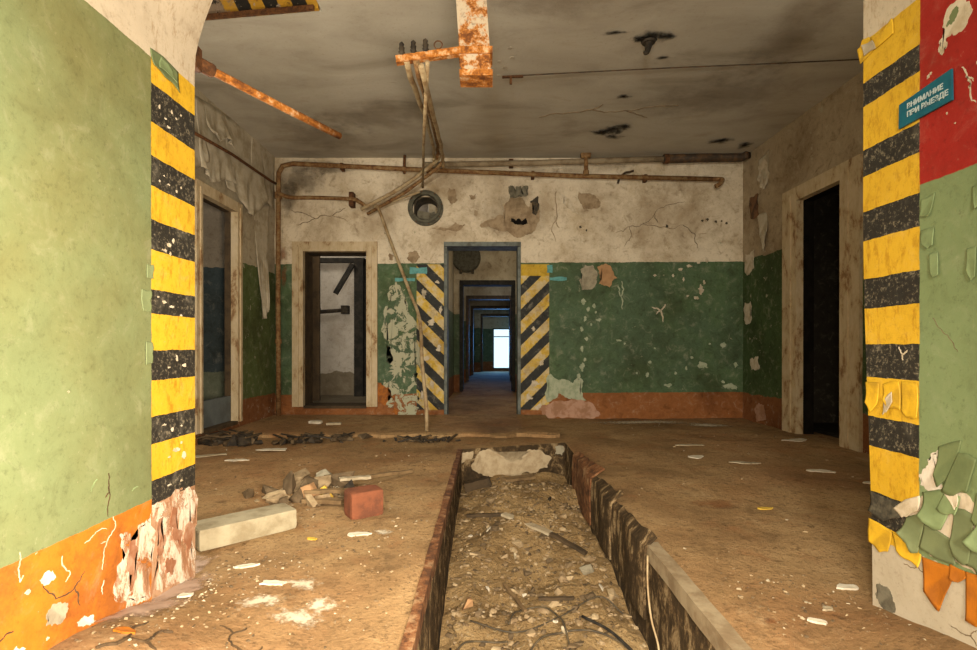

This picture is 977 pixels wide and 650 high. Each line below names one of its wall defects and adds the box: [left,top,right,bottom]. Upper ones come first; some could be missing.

peeling [938,0,973,55]
peeling [195,95,274,319]
flaking render [469,185,540,238]
peeling [919,192,938,278]
peeling [381,282,443,415]
peeling [526,264,617,419]
peeling [40,570,56,586]
peeling [46,602,69,641]
flaking render [113,479,198,608]
spalling [417,445,573,650]
spalling [587,522,701,650]
peeling [868,440,977,627]